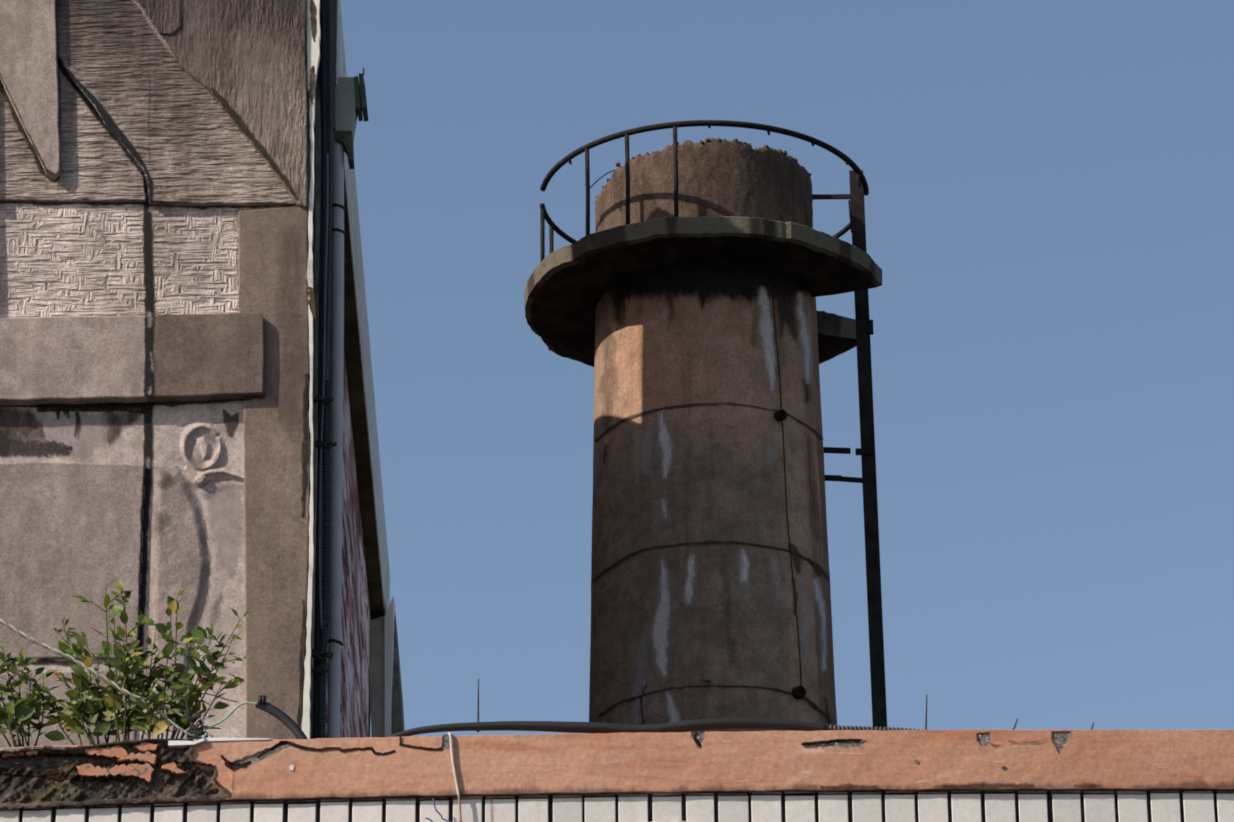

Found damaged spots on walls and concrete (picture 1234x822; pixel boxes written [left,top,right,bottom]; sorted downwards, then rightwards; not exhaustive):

efflorescence [759,288,776,390]
efflorescence [797,293,812,383]
leakage [0,403,145,458]
efflorescence [642,412,672,478]
efflorescence [685,556,695,603]
leakage [771,543,826,669]
efflorescence [632,561,670,724]
spalling [0,739,231,809]
crack [220,736,443,790]
spalling [801,739,869,749]
spalling [977,733,992,746]
spalling [1052,731,1071,755]